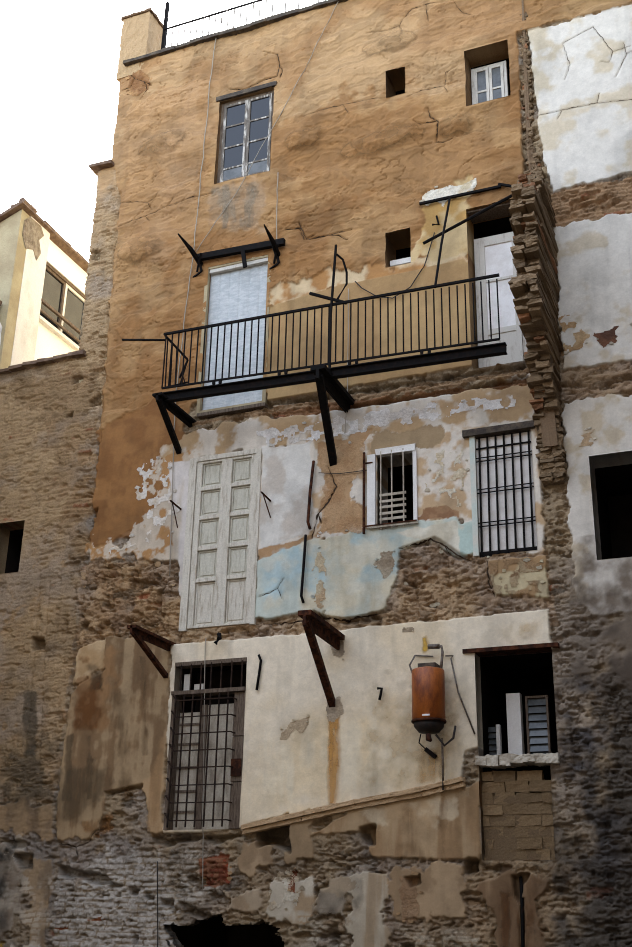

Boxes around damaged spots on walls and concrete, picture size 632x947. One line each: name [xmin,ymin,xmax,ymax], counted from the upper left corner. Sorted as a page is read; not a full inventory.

crack [564,27,630,80]
crack [540,93,632,119]
peeling [420,178,477,207]
peeling [558,315,632,356]
crack [312,467,337,538]
peeling [256,395,516,609]
spalling [81,456,180,638]
spalling [373,539,545,632]
leakage [2,692,48,799]
leakage [62,735,103,816]
peeling [280,714,310,740]
corrosion [328,717,339,803]